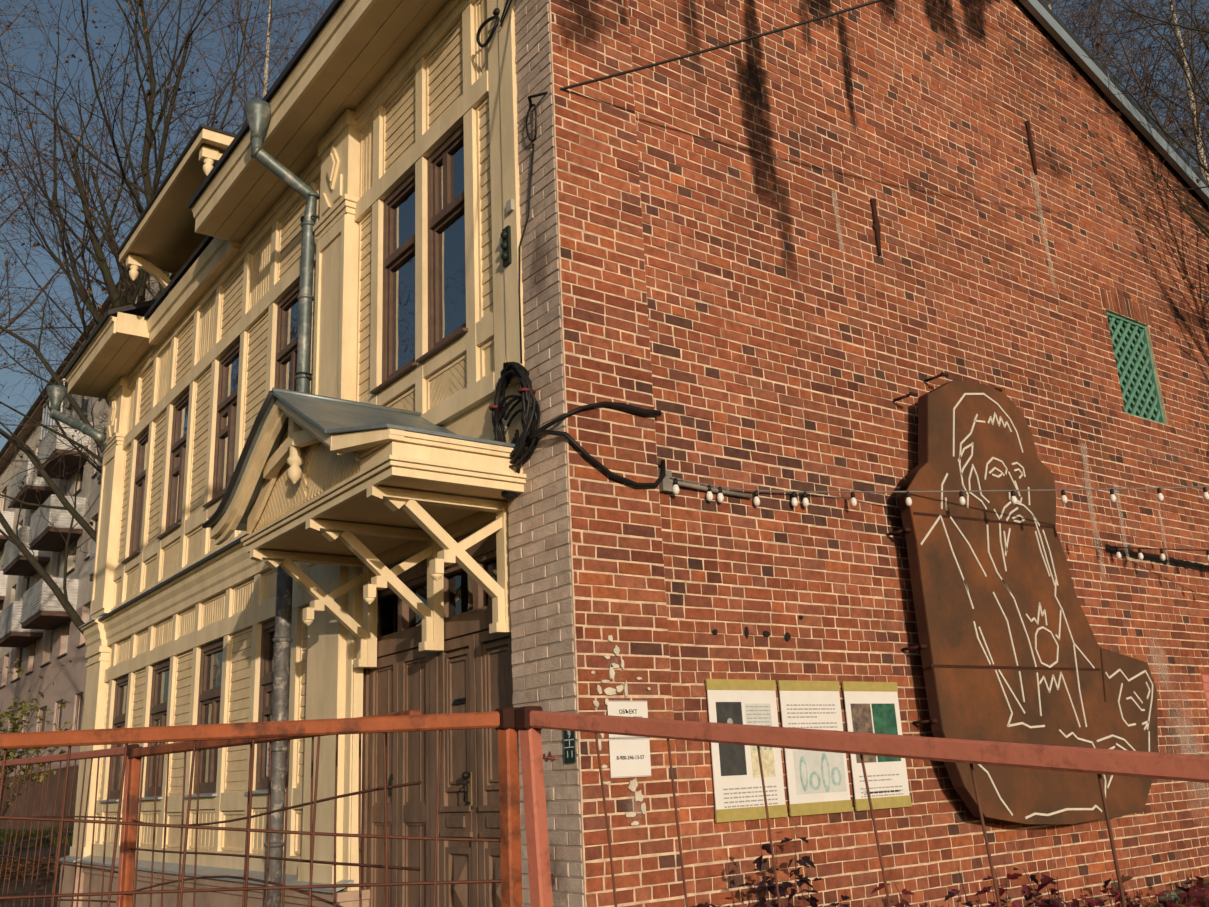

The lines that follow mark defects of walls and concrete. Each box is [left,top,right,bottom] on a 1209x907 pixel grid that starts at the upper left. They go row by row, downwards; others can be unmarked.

leakage [684,0,699,59]
leakage [880,0,897,19]
leakage [925,0,991,43]
leakage [800,0,857,128]
leakage [736,0,794,266]